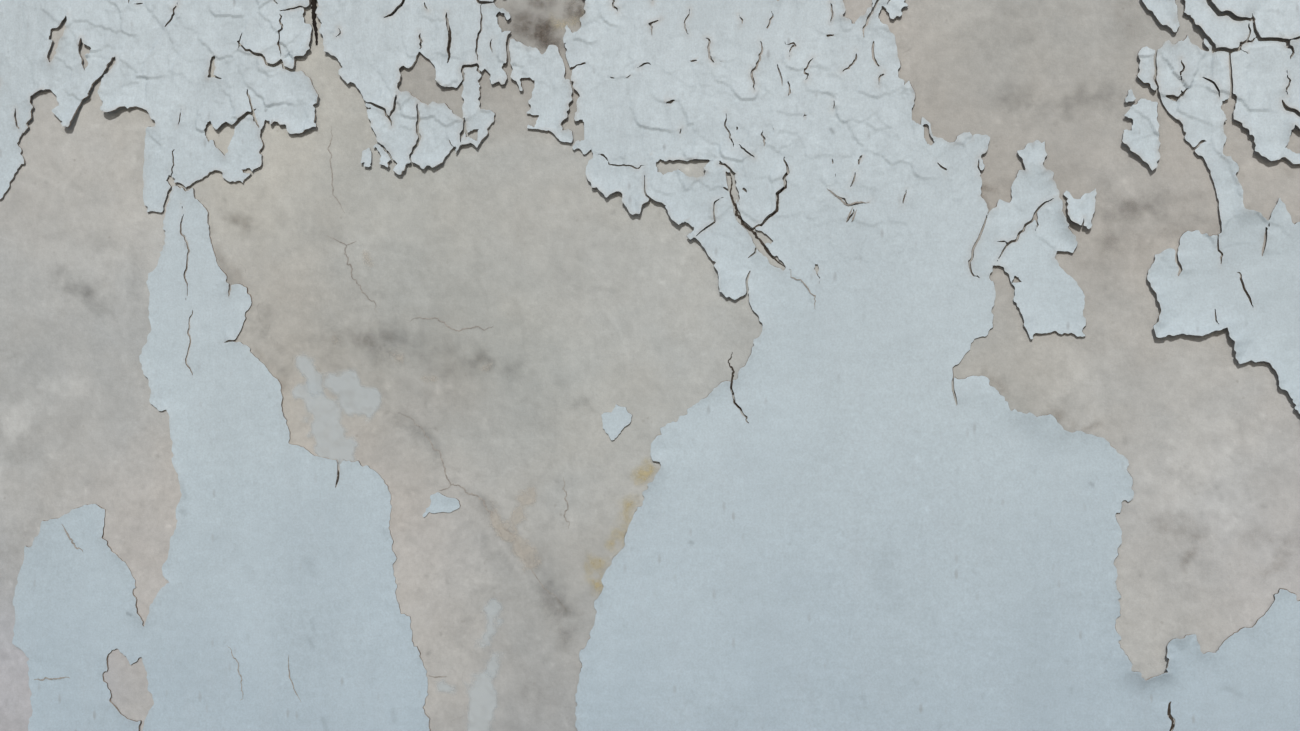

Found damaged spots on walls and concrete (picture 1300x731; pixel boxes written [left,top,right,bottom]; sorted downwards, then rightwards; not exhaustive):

peeling [0,0,561,731]
crack [310,0,318,45]
peeling [315,0,1300,731]